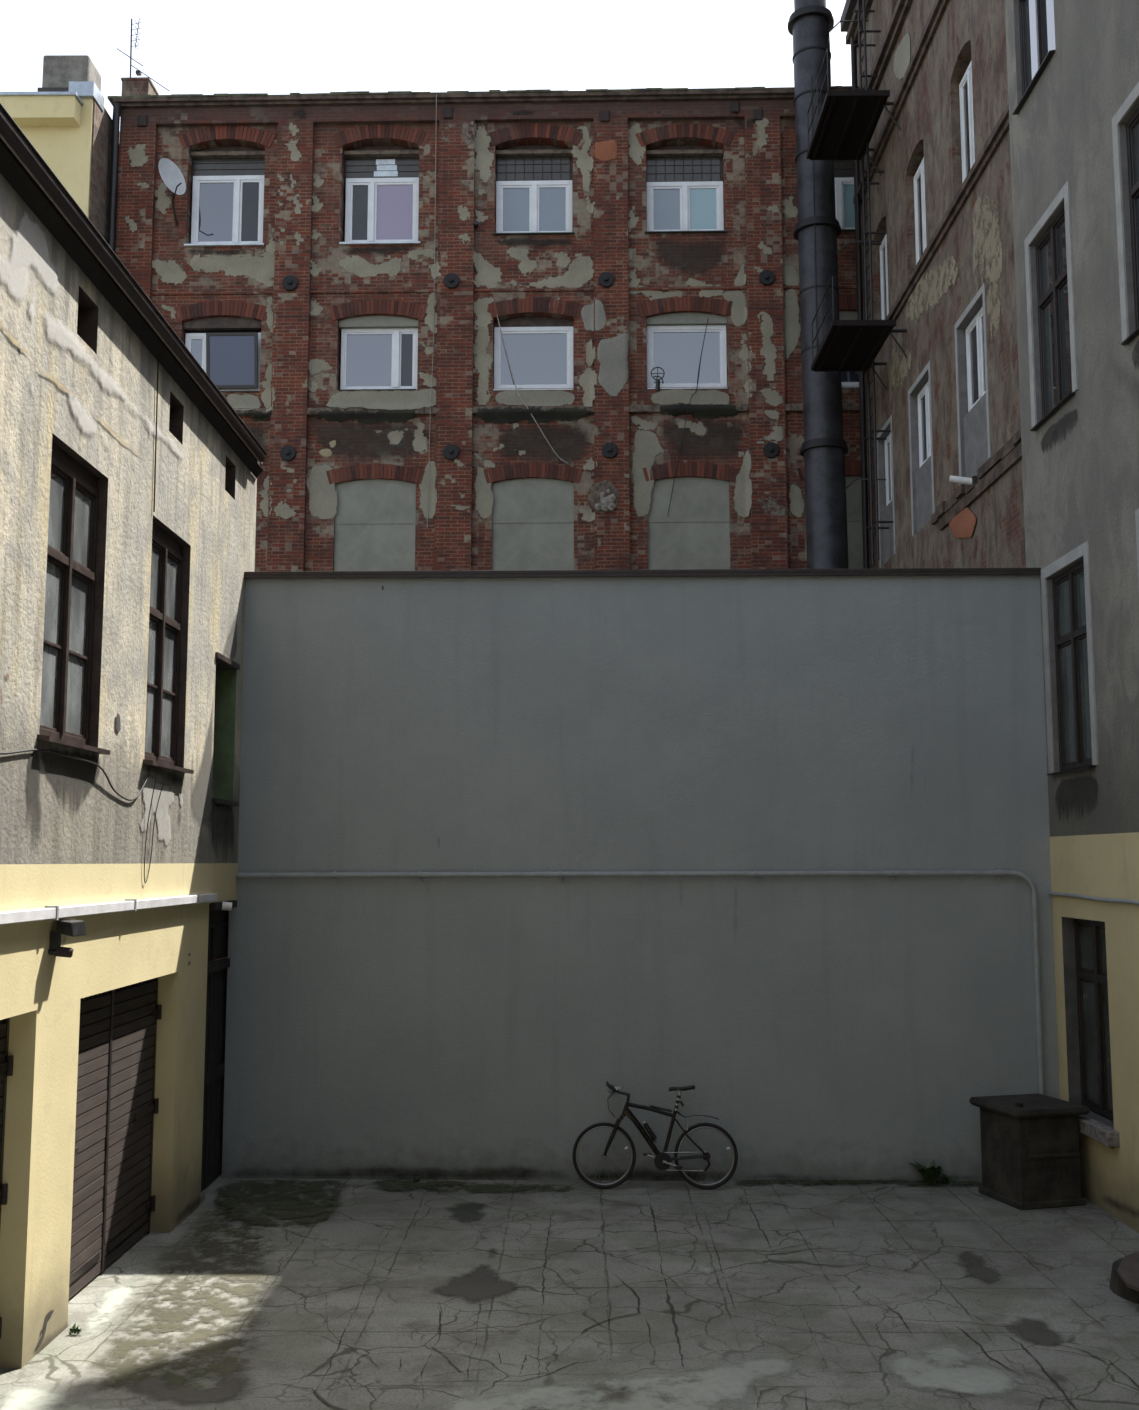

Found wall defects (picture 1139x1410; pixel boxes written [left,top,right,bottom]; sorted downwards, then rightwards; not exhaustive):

peeling [456,181,488,244]
peeling [553,251,571,268]
peeling [734,263,763,286]
peeling [310,300,323,316]
peeling [738,362,784,457]
spalling [583,458,620,514]
damp [224,619,237,658]
damp [27,749,100,832]
damp [147,715,234,861]
crack [283,1191,1139,1410]
crack [35,1310,54,1352]
damp [129,1377,248,1402]